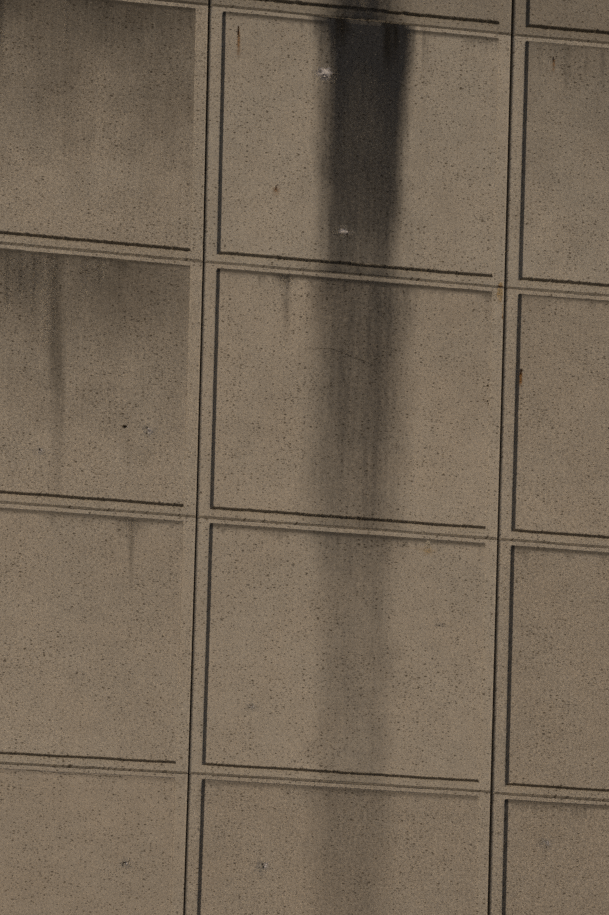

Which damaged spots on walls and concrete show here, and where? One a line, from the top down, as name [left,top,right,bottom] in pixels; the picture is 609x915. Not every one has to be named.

damp [318,0,411,433]